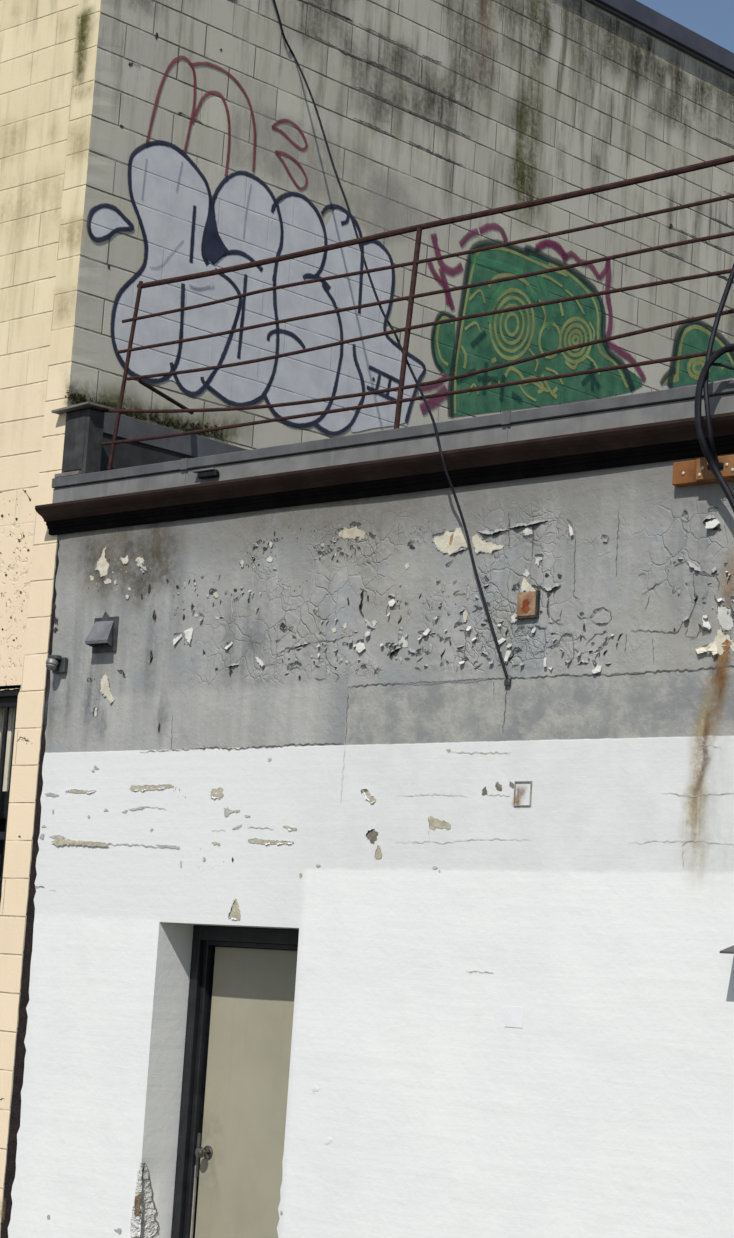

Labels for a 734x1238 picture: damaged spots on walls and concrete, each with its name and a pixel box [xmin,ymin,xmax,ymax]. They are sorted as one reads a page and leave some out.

leakage [77,13,89,76]
peeling [88,547,151,599]
peeling [239,521,376,594]
peeling [347,521,522,674]
peeling [511,554,562,593]
peeling [694,575,734,656]
crack [141,510,734,804]
corrosion [715,649,728,691]
spalling [39,789,183,868]
spalling [198,787,297,868]
spalling [366,828,382,859]
spalling [114,1163,159,1238]